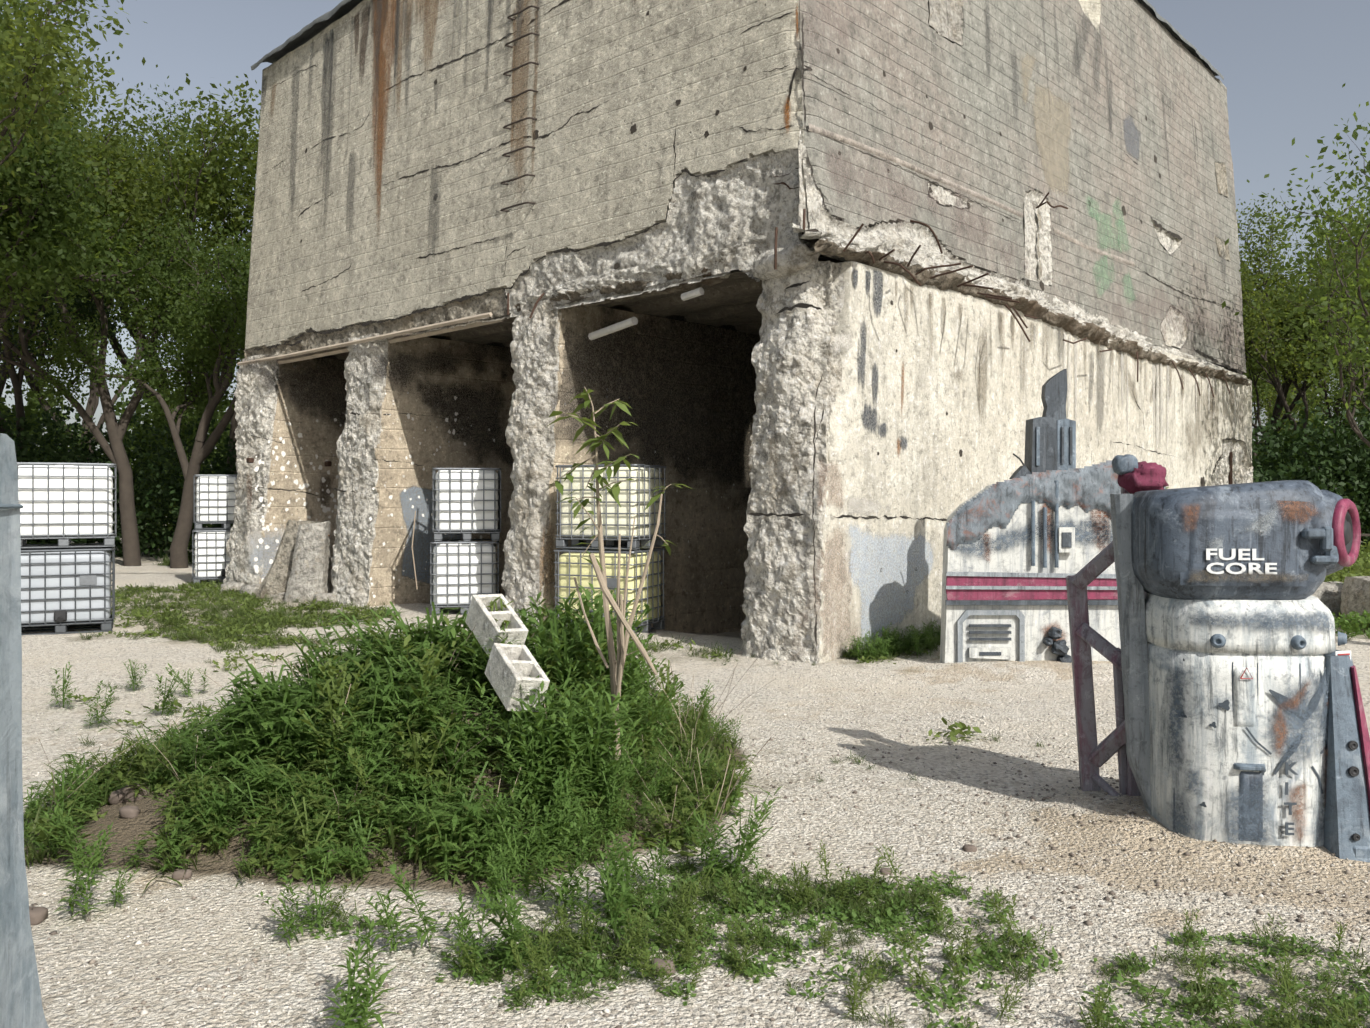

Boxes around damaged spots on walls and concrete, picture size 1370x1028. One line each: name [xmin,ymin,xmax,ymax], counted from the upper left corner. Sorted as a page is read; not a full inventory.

damp [290,0,410,196]
corrosion [354,0,437,217]
crack [245,0,1017,351]
spalling [244,129,1044,361]
spalling [1122,205,1182,254]
damp [834,269,907,450]
spalling [1160,307,1230,397]